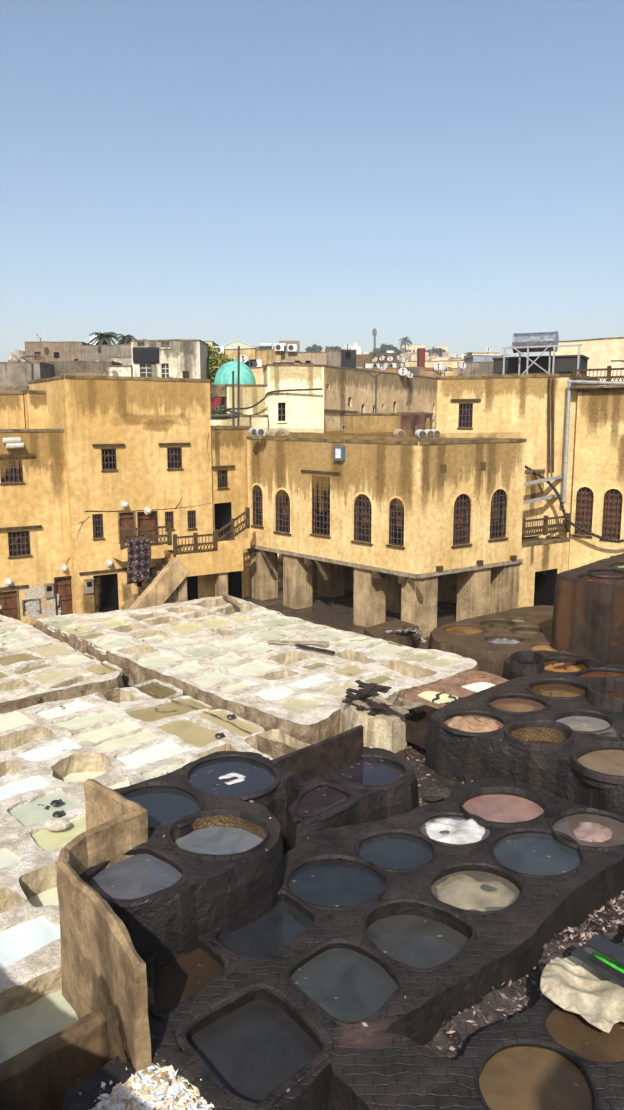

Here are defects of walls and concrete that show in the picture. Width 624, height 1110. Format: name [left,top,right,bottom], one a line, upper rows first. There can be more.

damp [74,341,204,431]
damp [583,388,624,472]
spalling [0,582,464,969]
spalling [0,967,79,1061]
spalling [90,973,127,1063]